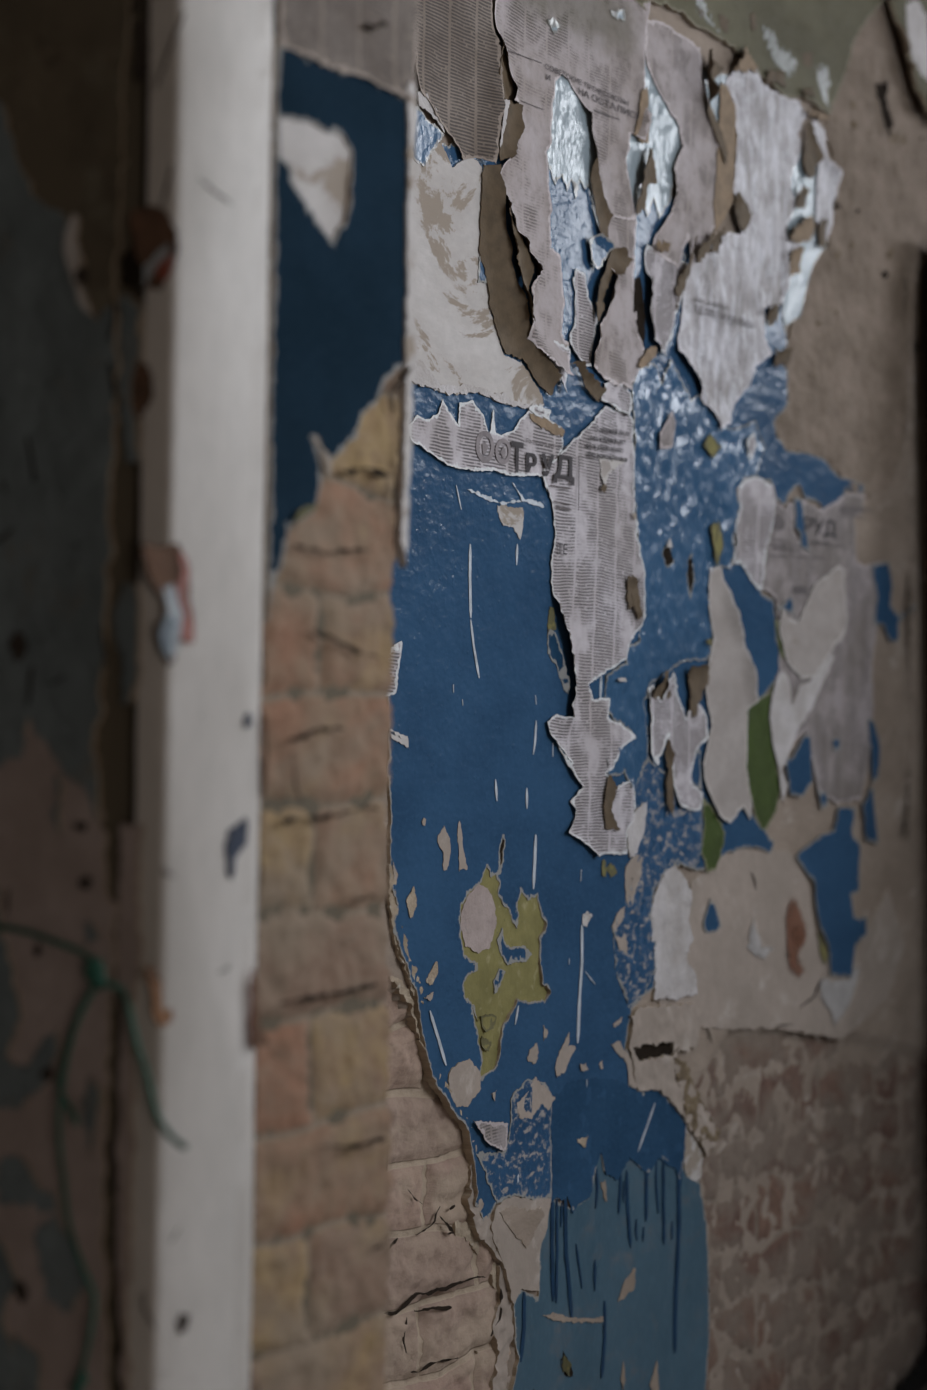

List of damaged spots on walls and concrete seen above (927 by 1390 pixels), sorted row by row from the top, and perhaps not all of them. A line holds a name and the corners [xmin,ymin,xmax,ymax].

peeling [64,213,98,320]
peeling [120,245,144,289]
peeling [250,0,927,1390]
flaking render [0,719,119,1390]